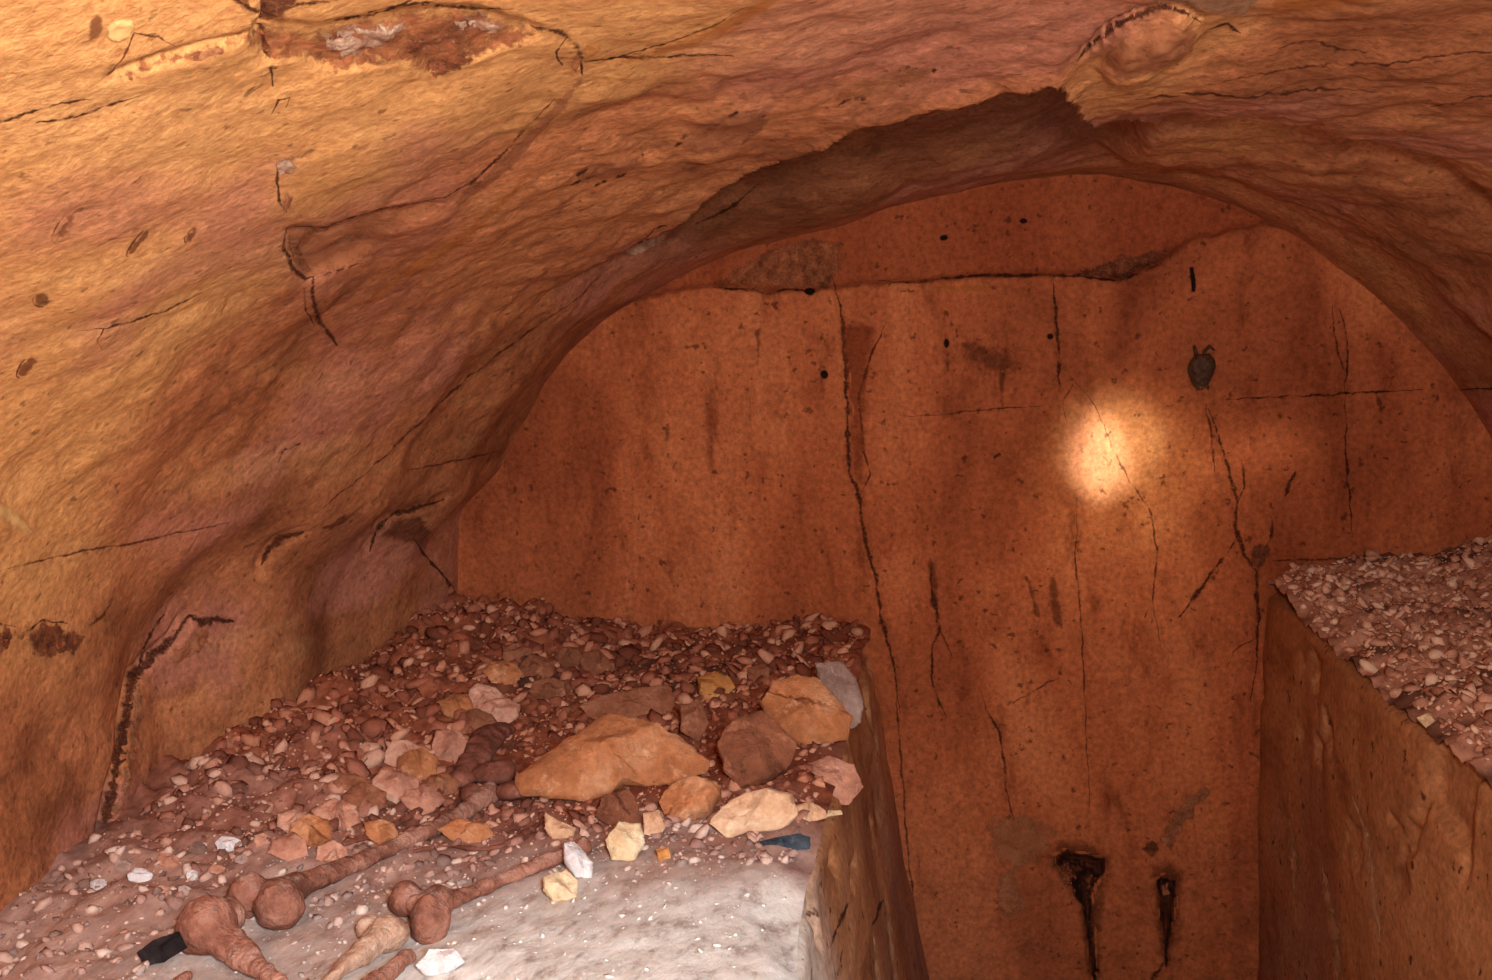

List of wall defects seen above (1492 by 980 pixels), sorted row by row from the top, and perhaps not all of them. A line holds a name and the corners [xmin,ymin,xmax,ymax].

spalling [125,0,533,80]
crack [101,614,234,824]
crack [811,278,952,974]
crack [982,497,1090,819]
crack [910,283,1492,702]